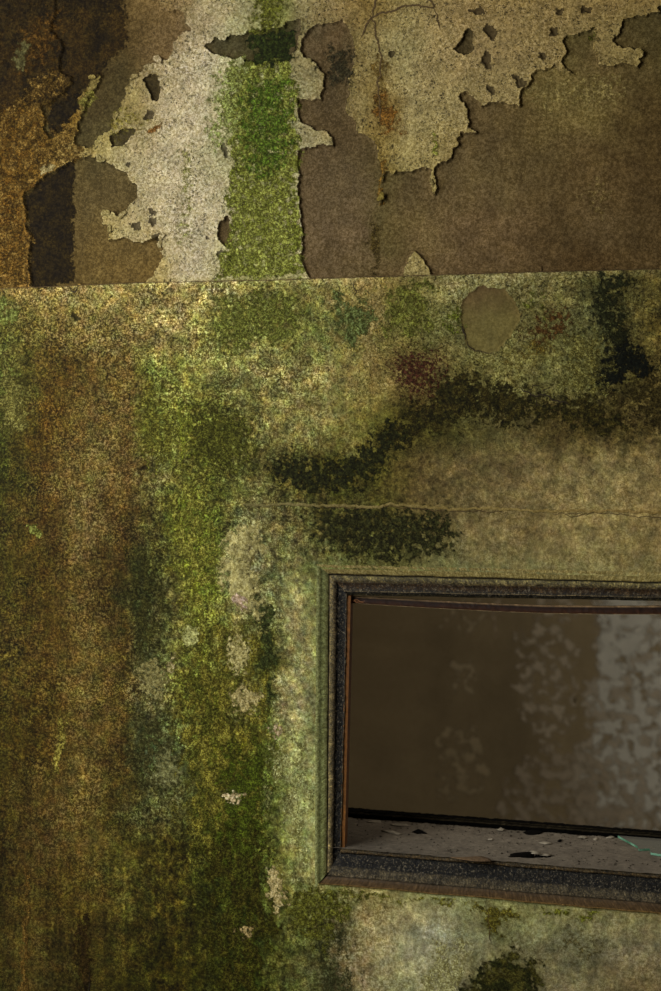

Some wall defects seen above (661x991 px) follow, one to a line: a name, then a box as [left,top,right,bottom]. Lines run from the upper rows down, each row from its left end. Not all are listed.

peeling [11,40,31,71]
flaking render [22,0,191,287]
flaking render [204,6,661,278]
water stain [13,342,32,387]
water stain [263,266,661,567]
crack [243,502,661,518]
water stain [115,536,176,676]
water stain [248,575,285,702]
water stain [121,701,190,814]
water stain [208,736,281,870]
water stain [420,928,545,991]